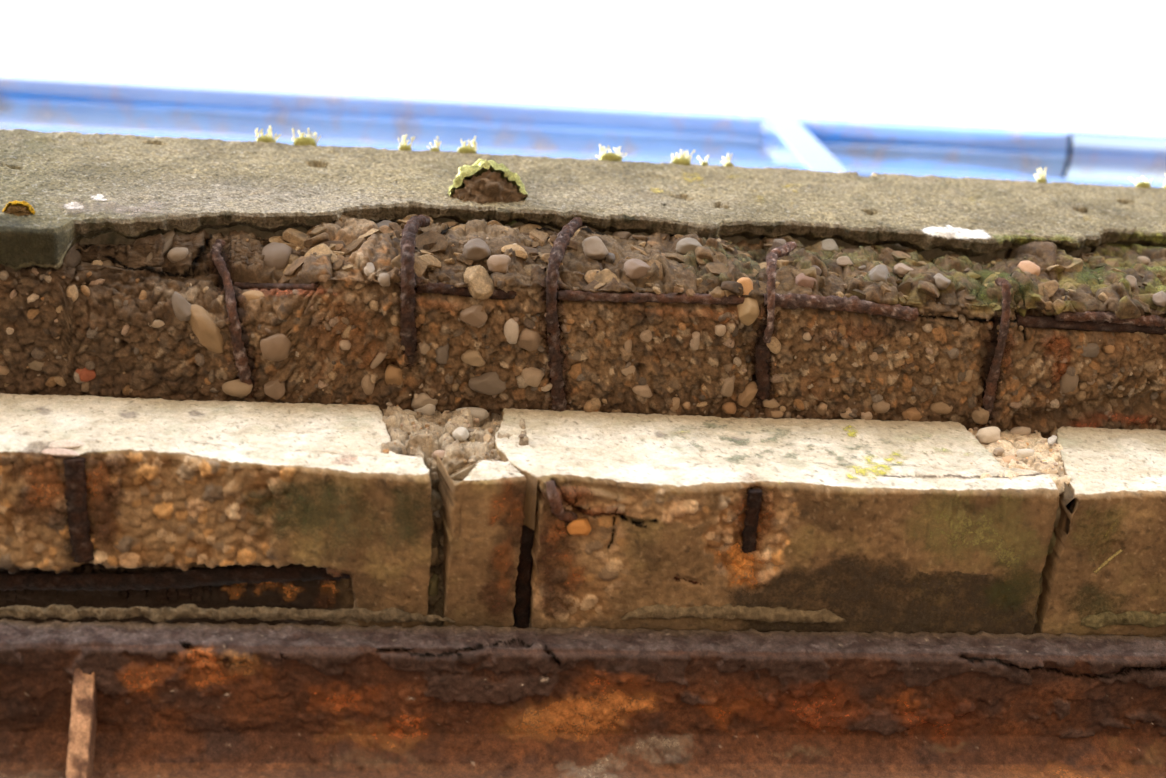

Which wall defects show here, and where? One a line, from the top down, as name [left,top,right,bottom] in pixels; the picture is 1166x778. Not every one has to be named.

rust [210,252,257,398]
rust [750,305,778,408]
rust [977,311,1011,428]
spalling [0,214,1166,627]
rust [0,444,353,610]
crack [551,479,657,549]
rust [717,487,774,586]
damp [733,554,1040,635]
rust [186,649,265,688]
rust [312,686,428,749]
rust [515,673,657,741]
crack [960,655,1166,678]